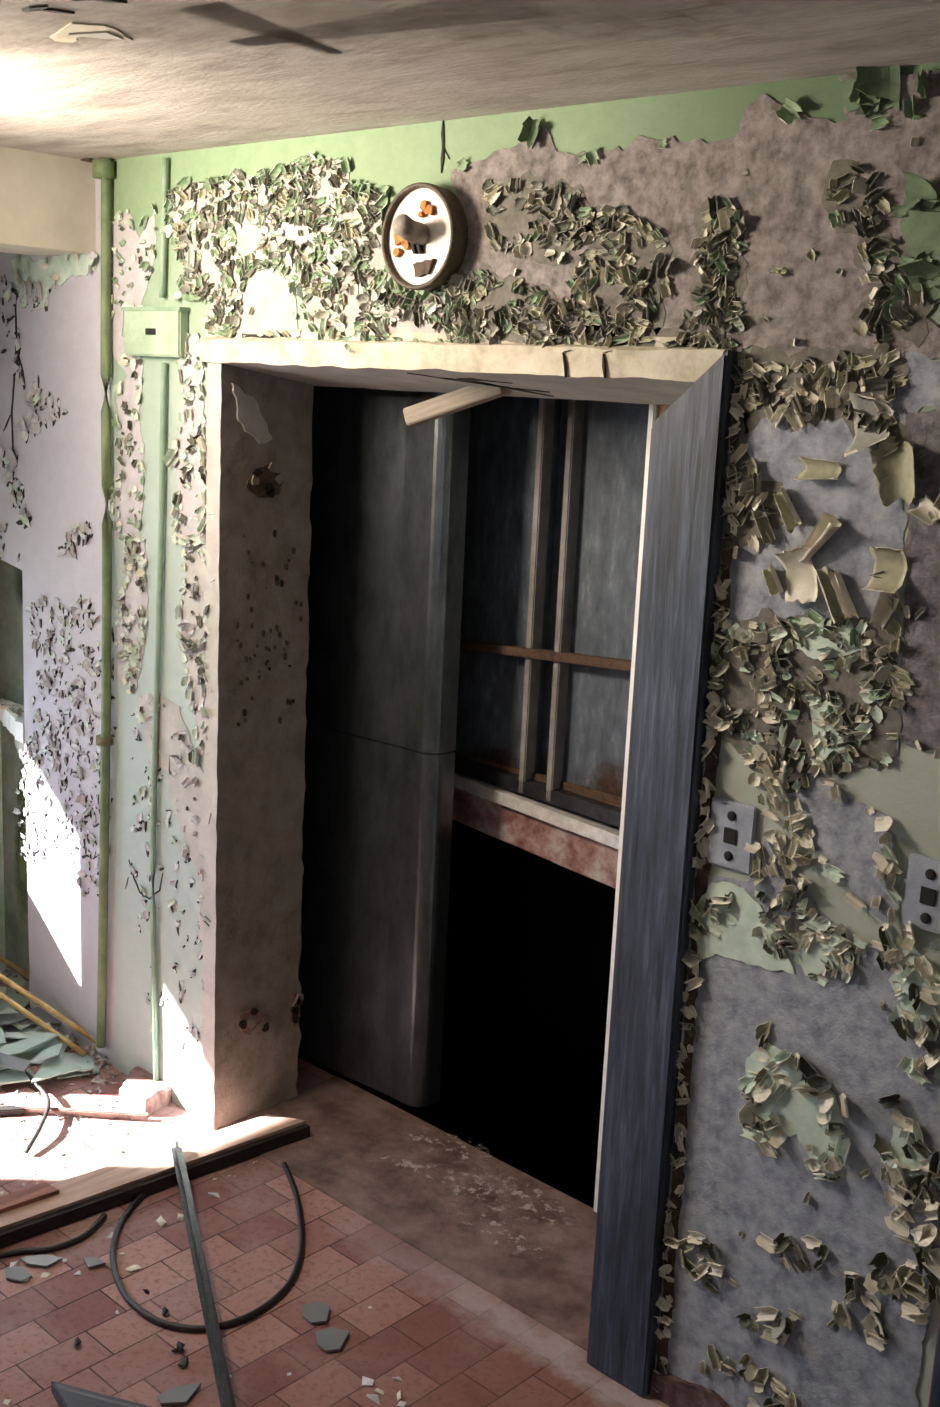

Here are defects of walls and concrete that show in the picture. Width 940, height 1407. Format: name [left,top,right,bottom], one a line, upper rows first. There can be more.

peeling [0,250,98,562]
peeling [0,594,115,898]
peeling [108,204,158,694]
peeling [128,332,215,945]
peeling [156,65,940,1407]
peeling [148,1024,202,1050]